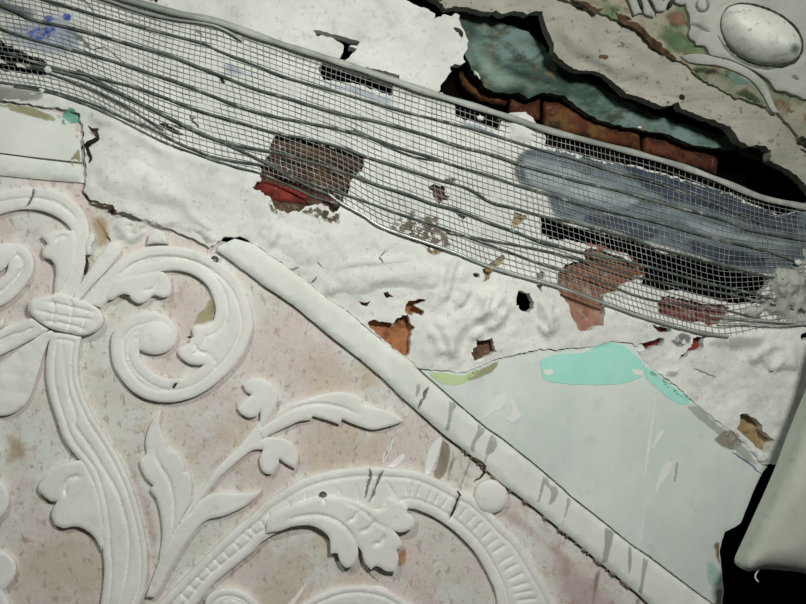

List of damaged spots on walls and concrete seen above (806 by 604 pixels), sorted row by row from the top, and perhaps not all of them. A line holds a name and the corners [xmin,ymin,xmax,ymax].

spalling [439,64,482,103]
spalling [499,94,570,106]
flaking render [253,135,364,213]
flaking render [428,184,447,204]
spalling [545,134,802,211]
flaking render [368,299,424,356]
flaking render [471,339,494,360]
flaking render [557,243,644,331]
flaking render [658,296,728,326]
flaking render [737,414,768,463]